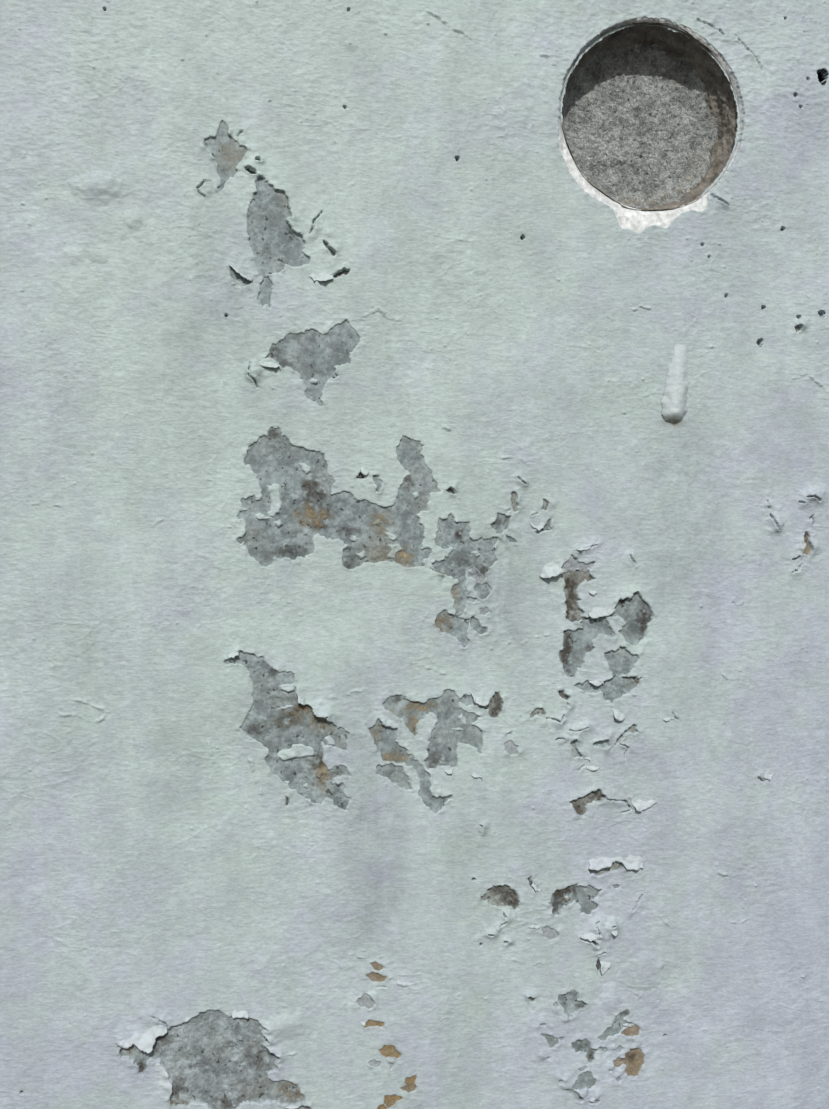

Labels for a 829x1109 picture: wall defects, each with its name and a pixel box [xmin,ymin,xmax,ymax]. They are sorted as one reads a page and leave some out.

peeling [204,121,247,192]
peeling [229,178,349,308]
peeling [259,320,360,406]
peeling [237,427,517,647]
peeling [540,542,652,721]
peeling [224,651,350,810]
peeling [369,689,502,813]
peeling [570,789,605,815]
peeling [481,885,519,909]
peeling [531,854,644,915]
peeling [116,1010,311,1109]
peeling [541,1010,639,1103]